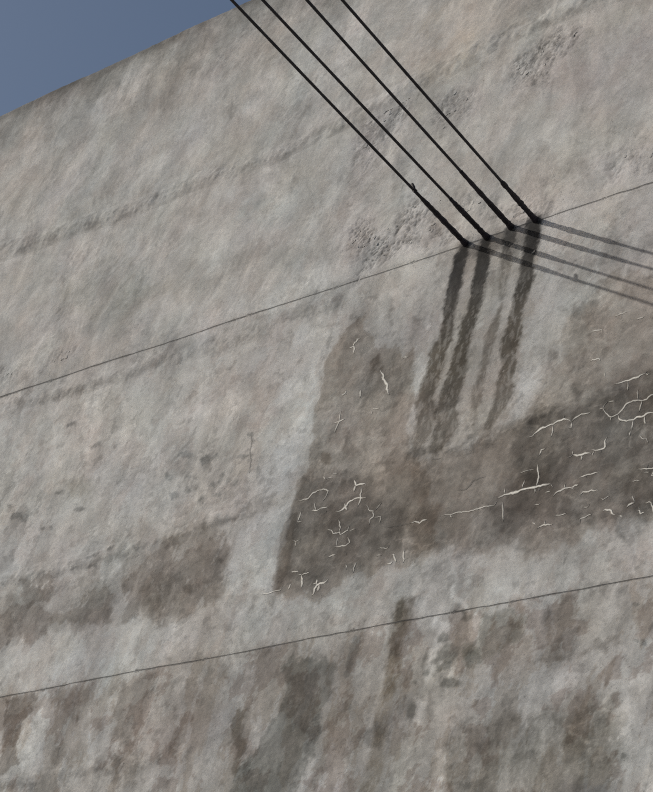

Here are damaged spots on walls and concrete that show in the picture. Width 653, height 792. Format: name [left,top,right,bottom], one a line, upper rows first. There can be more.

damp [263,209,653,609]
crack [411,358,653,529]
crack [262,571,328,596]
crack [294,473,381,573]
crack [376,547,407,564]